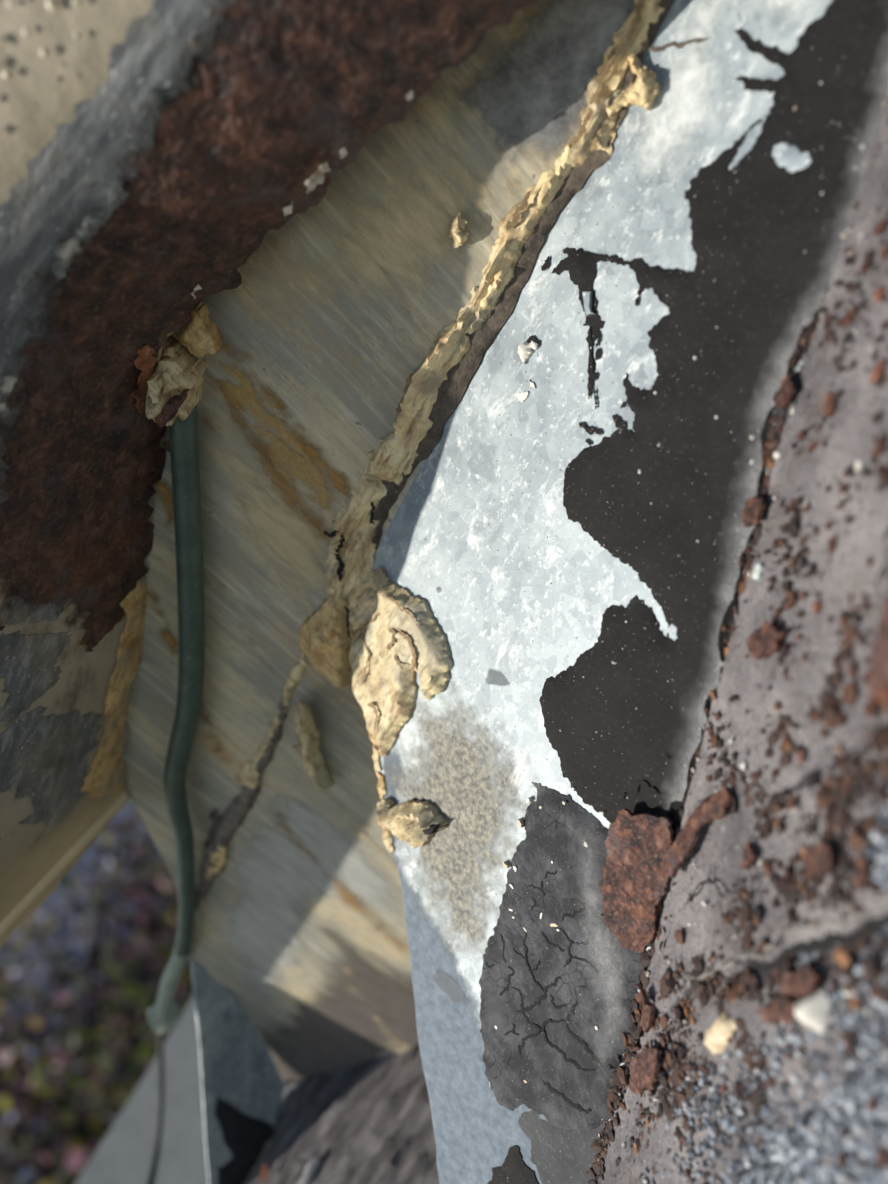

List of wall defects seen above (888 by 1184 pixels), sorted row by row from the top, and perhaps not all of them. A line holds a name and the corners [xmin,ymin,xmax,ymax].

peeling [729,114,769,170]
peeling [772,142,812,173]
peeling [0,0,231,428]
peeling [449,212,469,249]
corrosion [0,0,540,655]
peeling [667,624,678,641]
corrosion [747,622,787,660]
peeling [0,580,103,854]
corrosion [598,808,674,953]
crack [485,871,619,1114]
corrosion [628,988,662,1094]
corrosion [779,964,821,997]